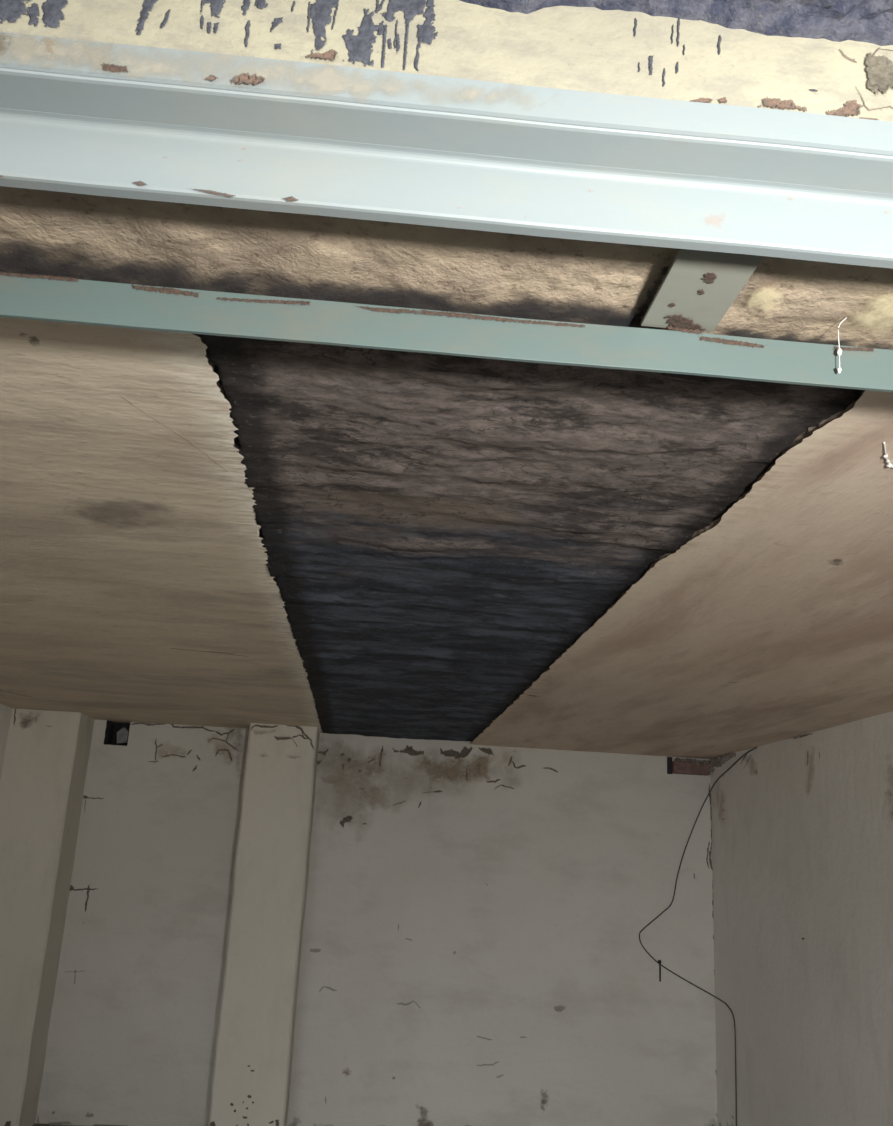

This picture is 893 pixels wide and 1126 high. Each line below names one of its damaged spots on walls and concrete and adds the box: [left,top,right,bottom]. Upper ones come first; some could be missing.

corrosion [302,49,338,61]
corrosion [759,96,807,112]
corrosion [827,100,878,120]
corrosion [133,285,199,297]
water stain [0,243,669,329]
corrosion [698,273,718,295]
corrosion [217,297,310,306]
corrosion [357,306,585,327]
corrosion [664,303,764,348]
crack [130,723,237,772]
flaking render [392,745,424,756]
flaking render [440,746,494,759]